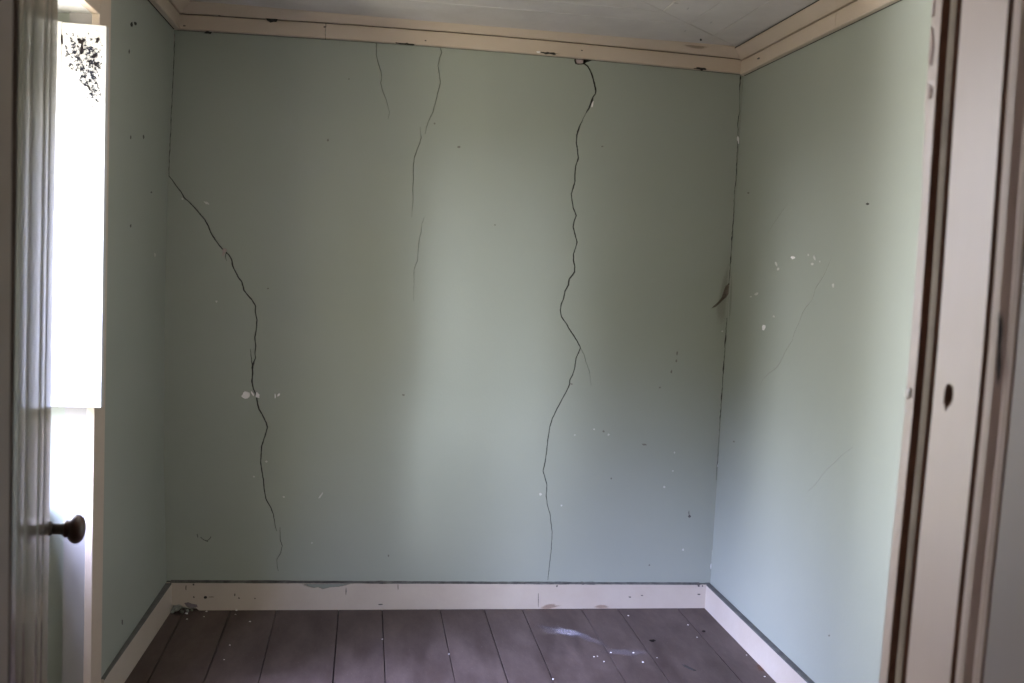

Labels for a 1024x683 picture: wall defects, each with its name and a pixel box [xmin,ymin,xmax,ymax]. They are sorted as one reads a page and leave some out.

leakage [61,32,103,115]
crack [169,40,282,568]
crack [412,48,442,269]
crack [543,63,596,575]